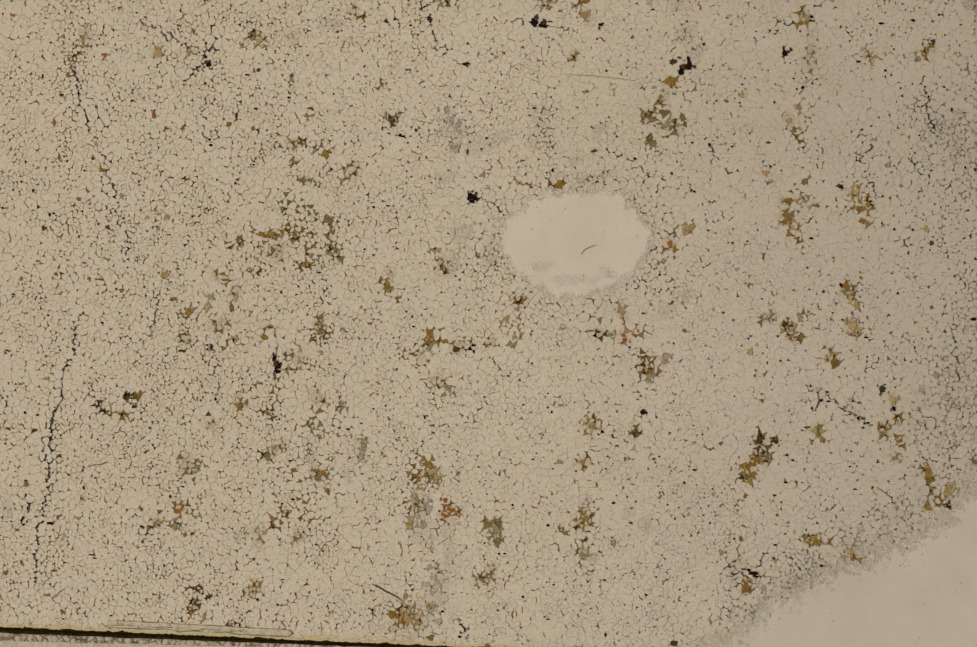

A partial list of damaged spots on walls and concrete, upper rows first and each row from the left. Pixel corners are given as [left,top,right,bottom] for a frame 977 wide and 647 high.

crack [139,20,219,82]
crack [415,0,468,64]
peeling [640,56,696,149]
crack [69,61,131,268]
peeling [224,136,361,277]
peeling [778,174,819,244]
crack [806,385,872,426]
crack [20,312,84,587]
peeling [391,453,474,530]
peeling [734,426,781,498]
peeling [917,461,960,511]
crack [727,537,771,586]